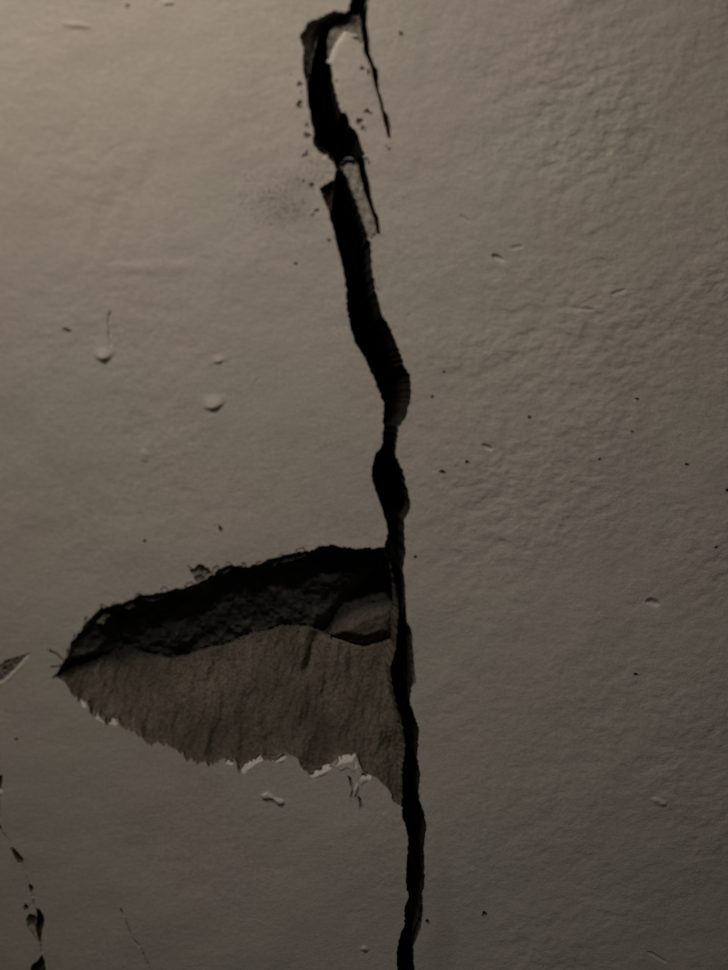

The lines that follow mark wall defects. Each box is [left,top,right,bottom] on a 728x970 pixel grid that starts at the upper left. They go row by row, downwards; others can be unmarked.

crack [290,0,427,970]
peeling [0,652,31,685]
spalling [48,544,407,810]